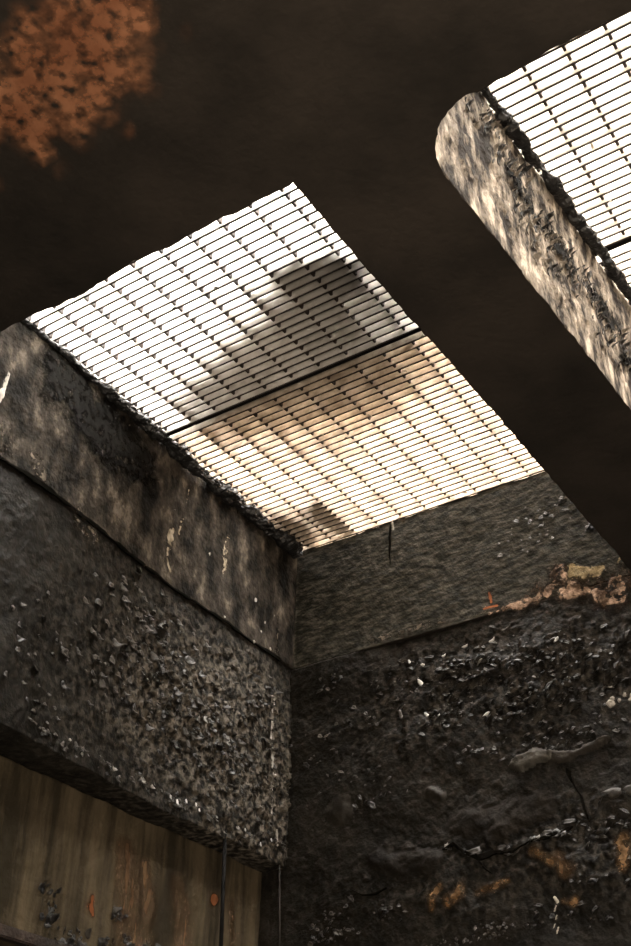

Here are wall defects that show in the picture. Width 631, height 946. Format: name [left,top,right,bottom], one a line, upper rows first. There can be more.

spalling [463,95,631,375]
peeling [318,705,379,754]
peeling [326,765,391,811]
peeling [362,557,631,773]